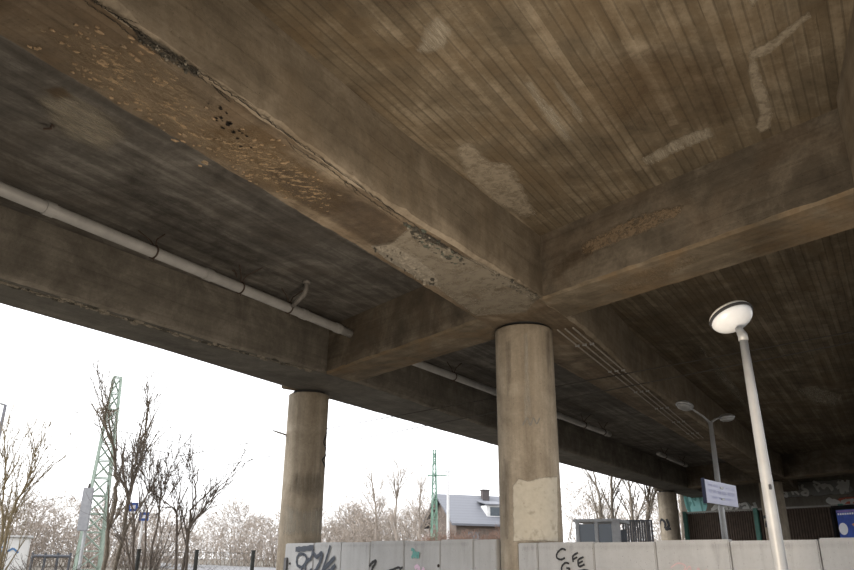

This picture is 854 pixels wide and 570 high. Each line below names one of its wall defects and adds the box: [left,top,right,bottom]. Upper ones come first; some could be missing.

peeling [40,23,342,212]
crack [85,0,533,295]
spalling [403,222,465,265]